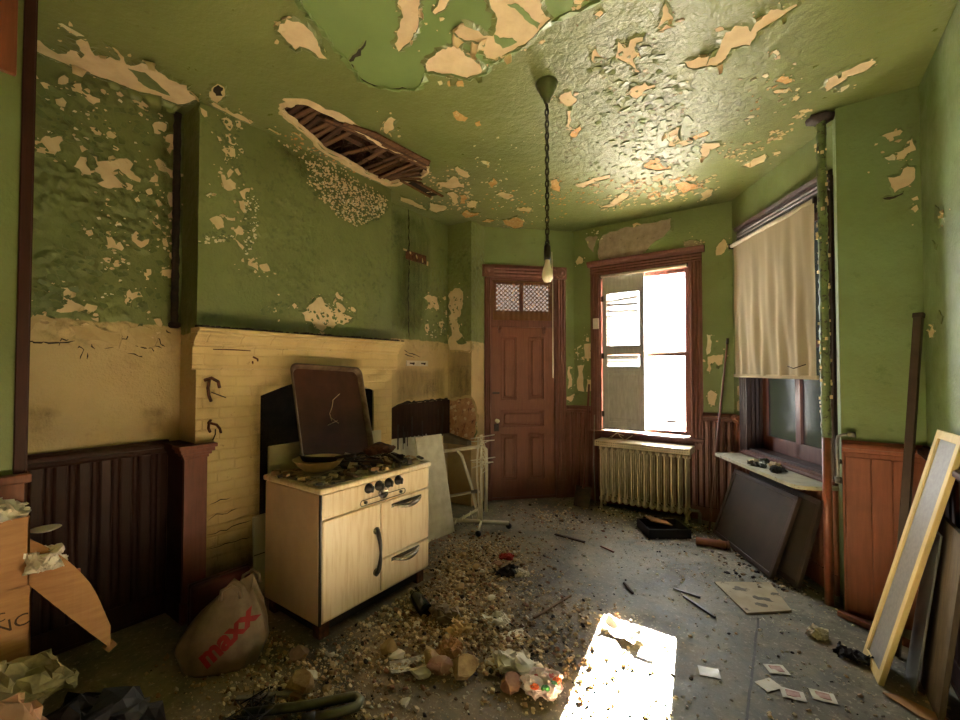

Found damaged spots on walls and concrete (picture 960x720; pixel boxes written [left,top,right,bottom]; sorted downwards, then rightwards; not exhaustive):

peeling [265,0,880,229]
peeling [31,20,276,338]
peeling [874,128,920,225]
spalling [574,216,674,267]
crack [30,329,171,359]
peeling [259,291,357,334]
peeling [421,283,473,353]
peeling [566,327,591,403]
peeling [818,307,833,407]